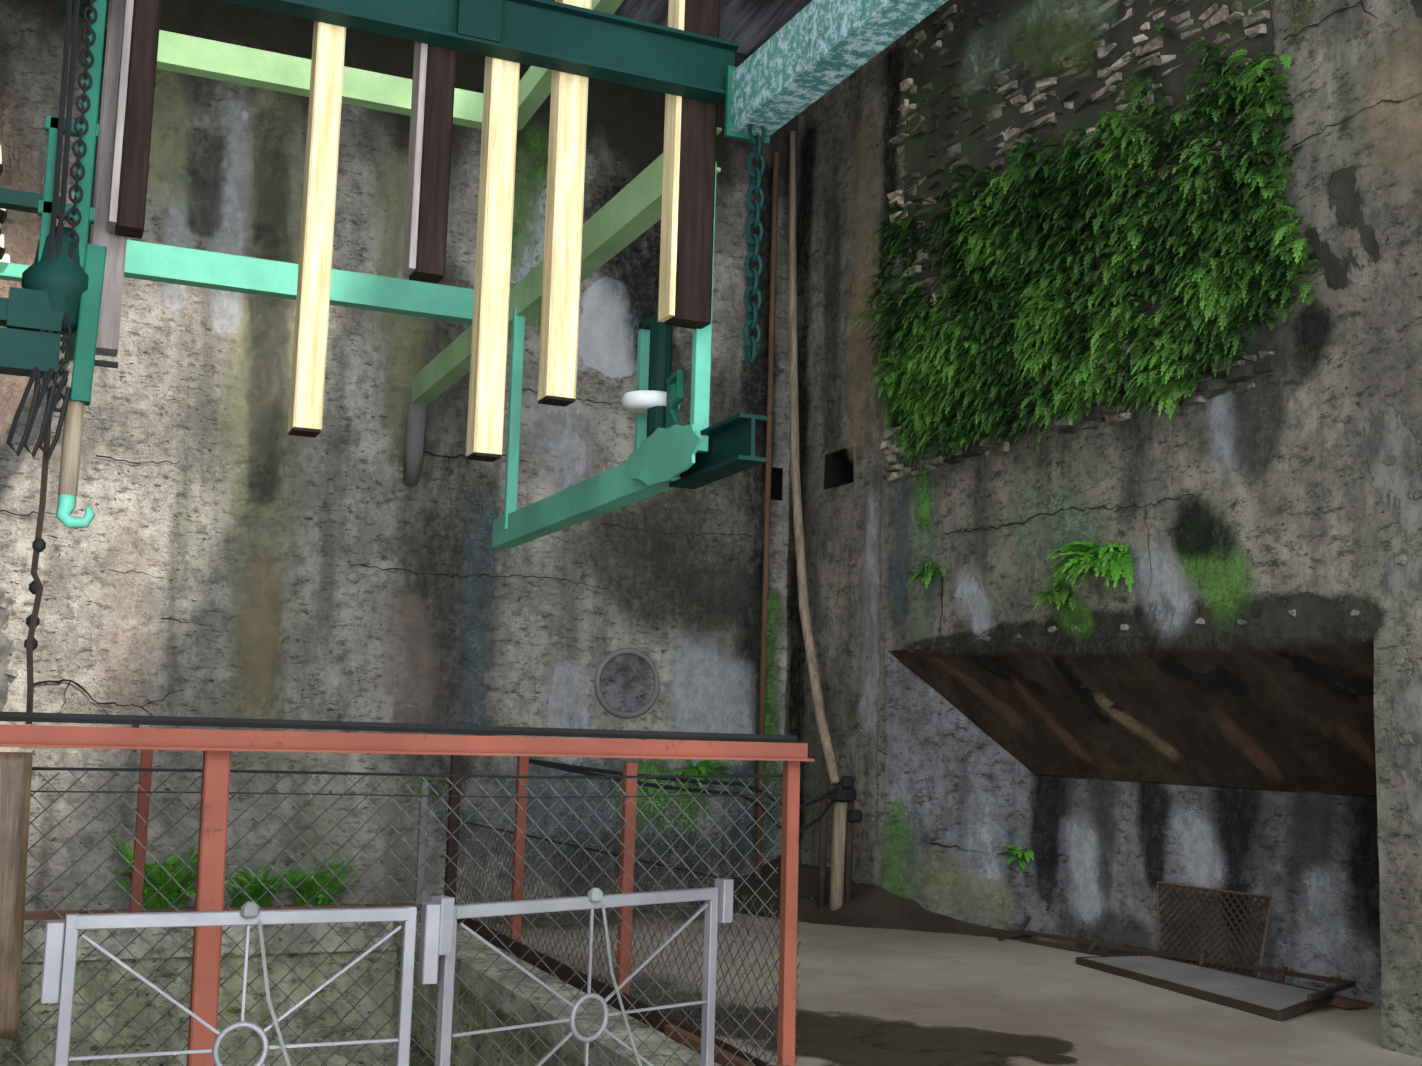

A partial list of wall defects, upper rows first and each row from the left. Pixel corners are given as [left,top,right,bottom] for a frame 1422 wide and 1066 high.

water stain [1211,306,1332,477]
water stain [1120,411,1142,520]
water stain [1173,498,1234,556]
water stain [956,575,990,632]
water stain [1138,548,1188,625]
water stain [1031,774,1148,955]
water stain [1139,781,1259,936]
water stain [1296,791,1330,923]
water stain [1343,794,1381,946]
water stain [604,975,778,1051]
water stain [795,1009,1079,1066]